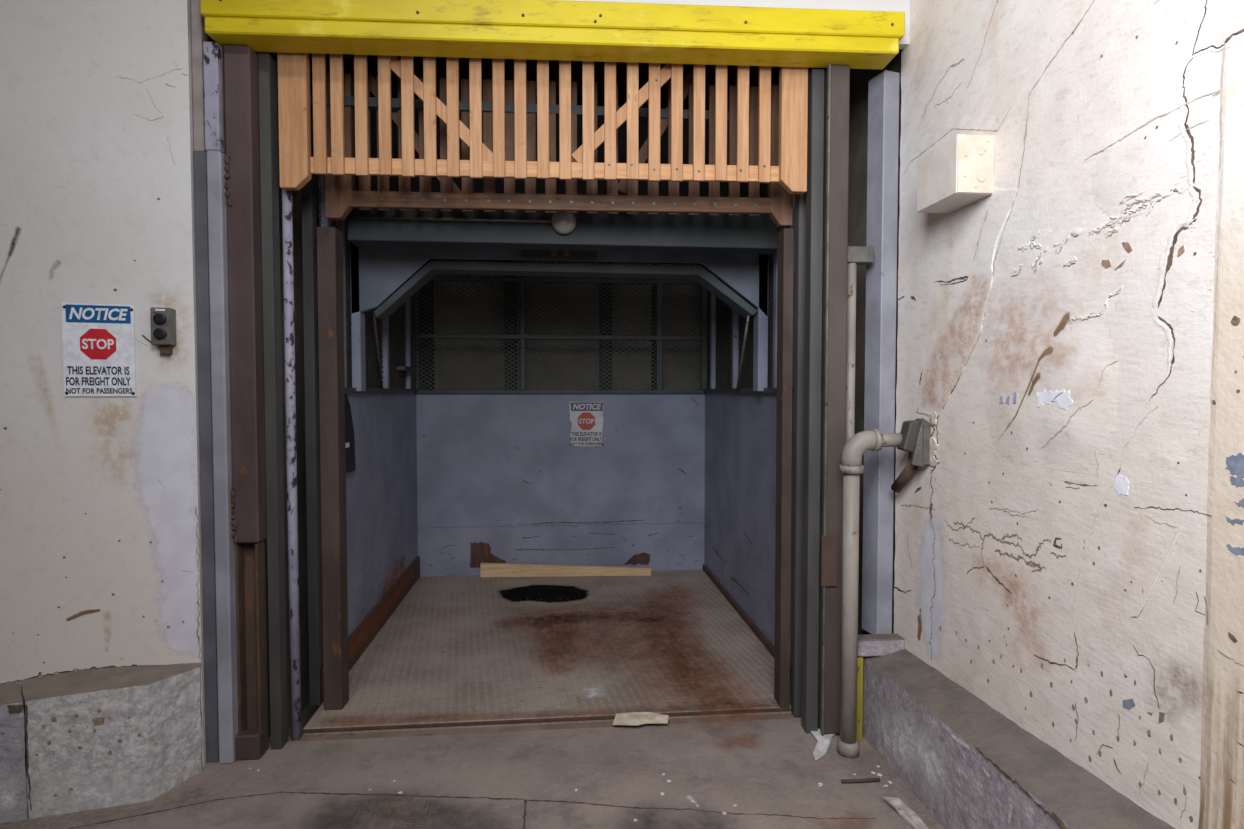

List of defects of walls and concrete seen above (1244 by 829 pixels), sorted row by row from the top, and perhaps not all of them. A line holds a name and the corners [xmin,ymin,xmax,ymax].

spalling [1011,185,1190,277]
corrosion [1007,313,1069,428]
crack [893,0,1244,672]
spalling [1069,284,1124,324]
peeling [1225,453,1244,525]
peeling [1226,544,1244,555]
crack [1075,702,1148,794]